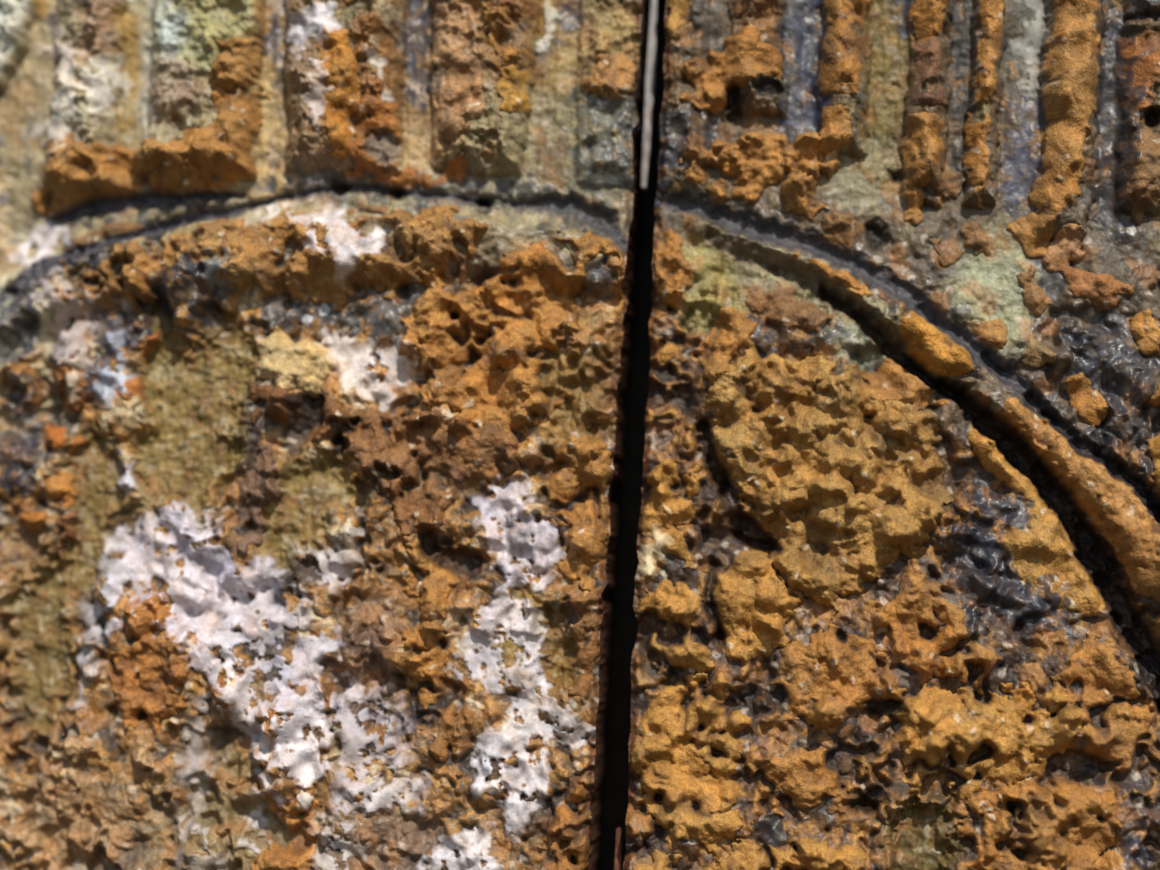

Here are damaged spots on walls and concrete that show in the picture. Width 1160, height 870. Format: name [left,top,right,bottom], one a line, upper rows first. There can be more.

rust [31,37,271,217]
rust [315,4,533,189]
rust [579,45,637,104]
rust [652,228,695,321]
rust [674,0,873,251]
rust [900,0,1005,268]
rust [1006,0,1134,370]
damp [64,445,448,870]
rust [63,203,627,780]
damp [414,473,596,870]
rust [629,286,1160,870]
rust [537,770,592,870]